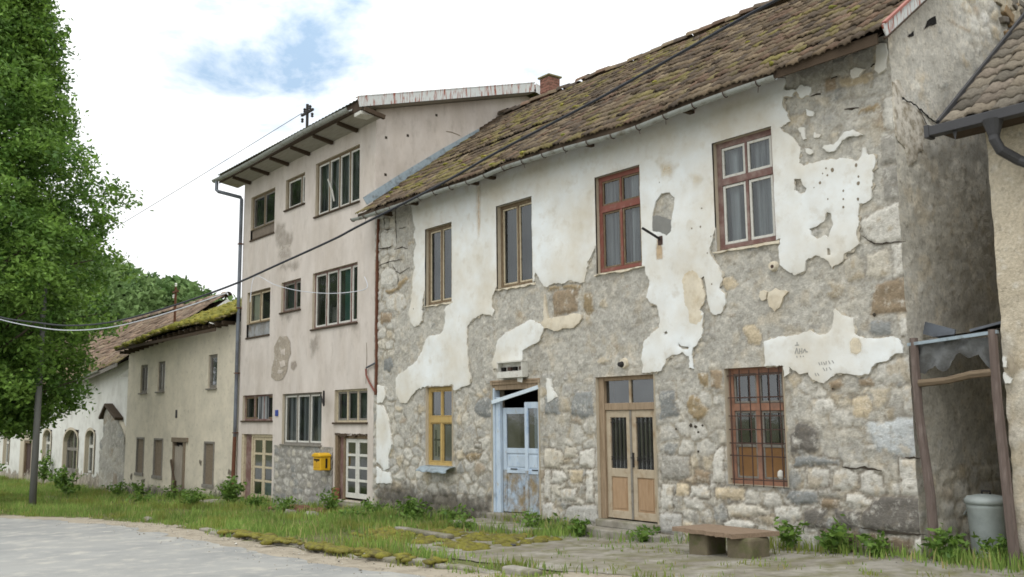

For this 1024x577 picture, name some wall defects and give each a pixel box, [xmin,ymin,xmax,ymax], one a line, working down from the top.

spalling [372,35,926,557]
spalling [271,336,291,381]
crack [843,464,882,472]